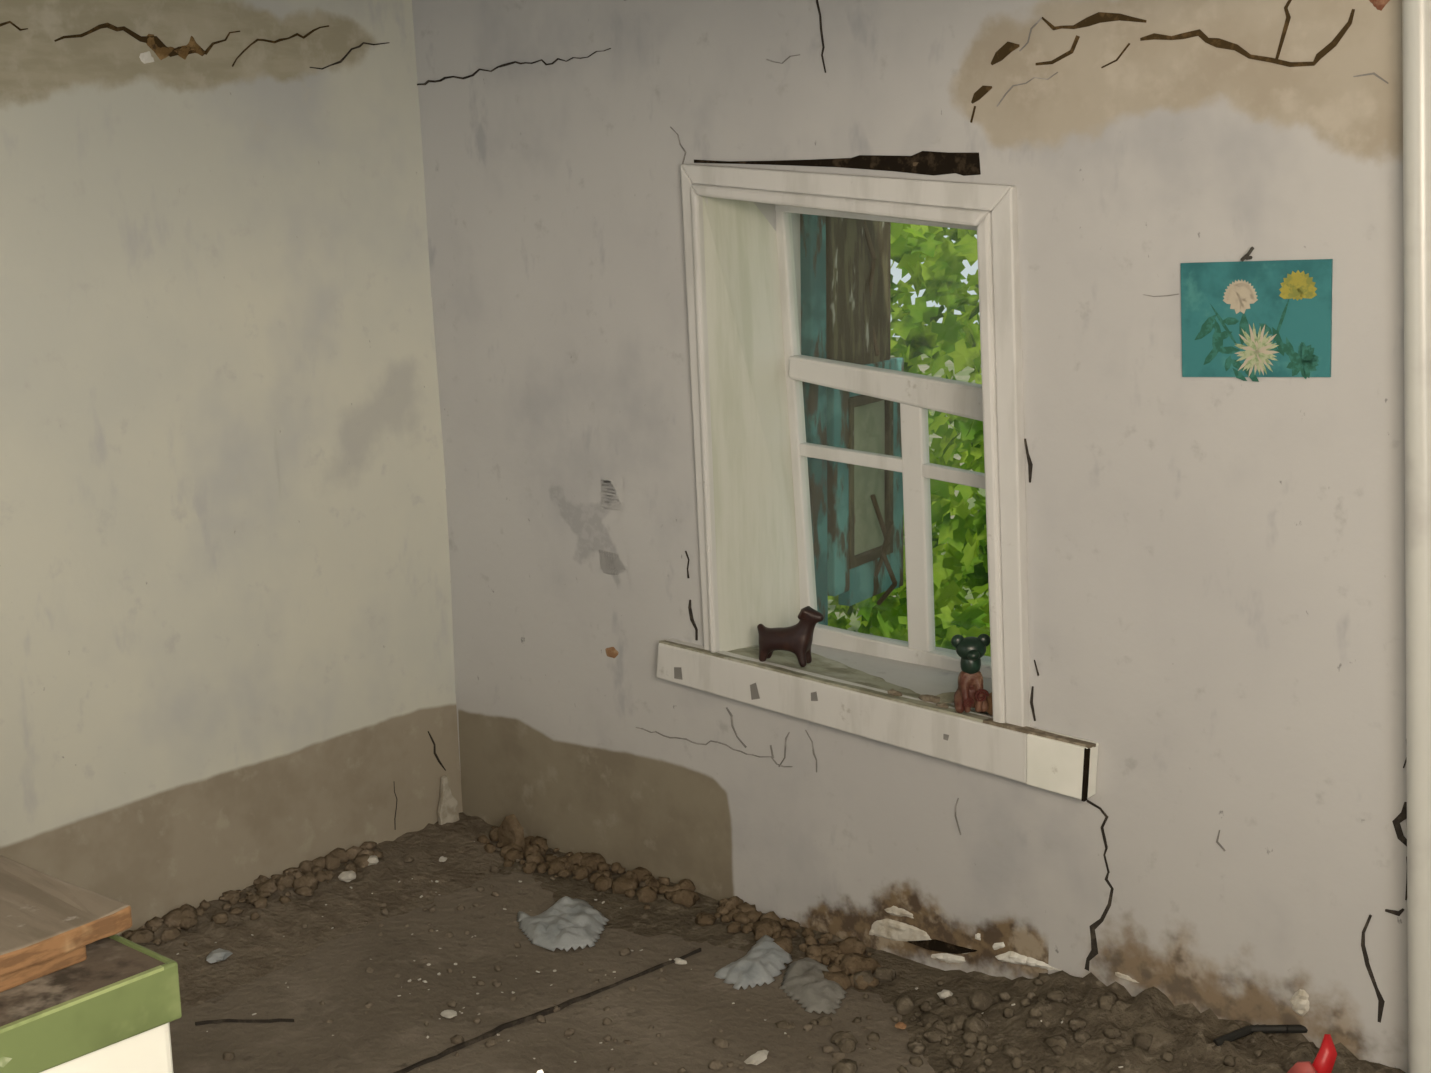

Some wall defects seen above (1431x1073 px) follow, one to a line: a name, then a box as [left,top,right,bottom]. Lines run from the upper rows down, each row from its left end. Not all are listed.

crack [0,21,390,70]
crack [417,48,611,85]
crack [970,0,1355,123]
crack [1353,72,1388,84]
crack [636,707,817,772]
crack [954,798,962,835]
flaking render [869,906,1061,971]
crack [1085,800,1114,971]
crack [1361,802,1407,1023]